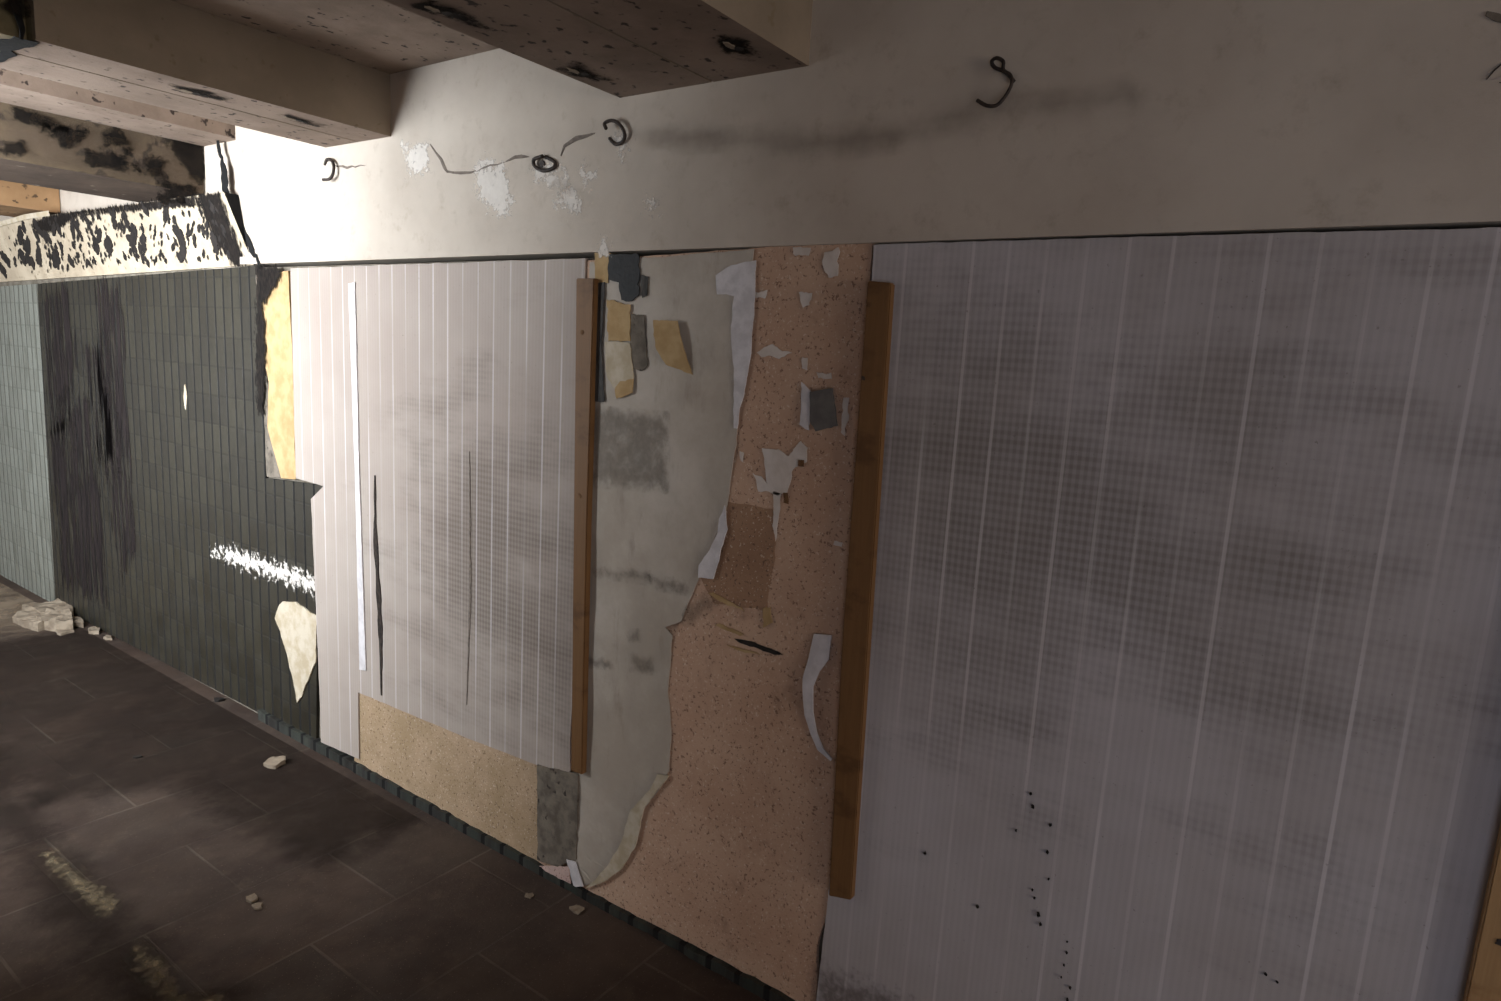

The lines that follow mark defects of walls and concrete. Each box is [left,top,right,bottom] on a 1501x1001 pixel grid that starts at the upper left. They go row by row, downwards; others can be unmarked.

crack [0,0,39,63]
damp [0,107,206,207]
peeling [400,140,429,176]
peeling [474,158,516,219]
peeling [532,163,597,215]
peeling [0,191,247,279]
peeling [598,238,609,258]
peeling [653,320,692,374]
damp [44,275,136,611]
spalling [715,607,782,655]
peeling [802,633,832,761]
peeling [566,859,584,887]